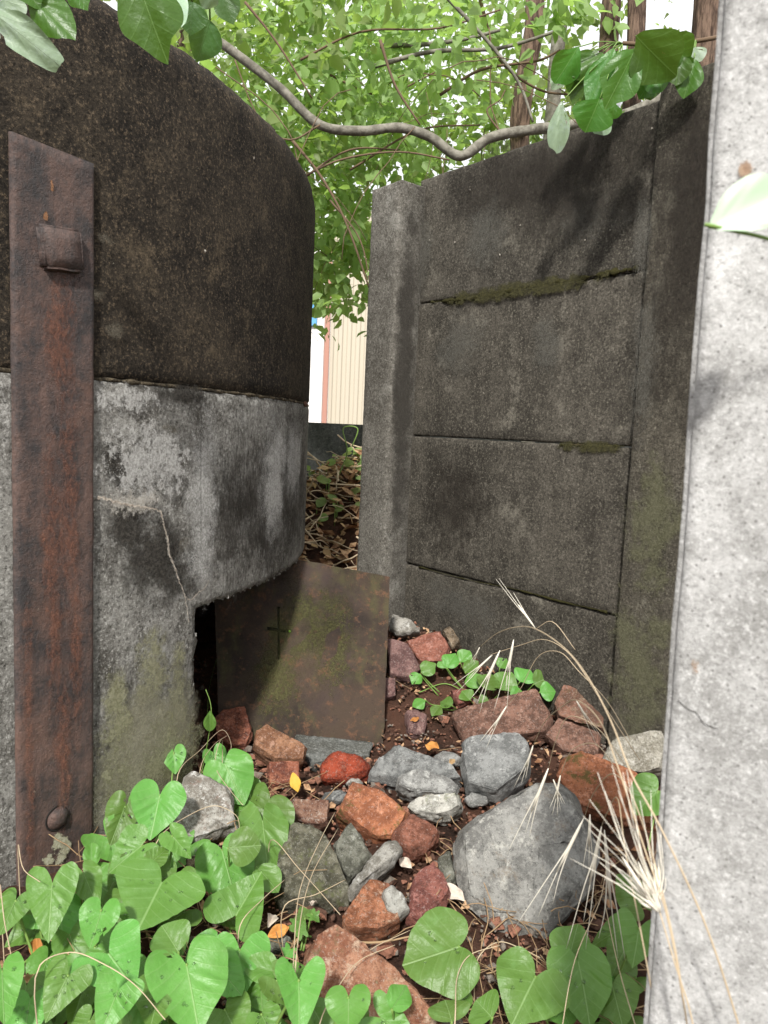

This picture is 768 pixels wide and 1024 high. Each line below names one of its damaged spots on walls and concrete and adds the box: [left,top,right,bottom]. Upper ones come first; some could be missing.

crack [97,489,209,622]
leakage [93,383,307,610]